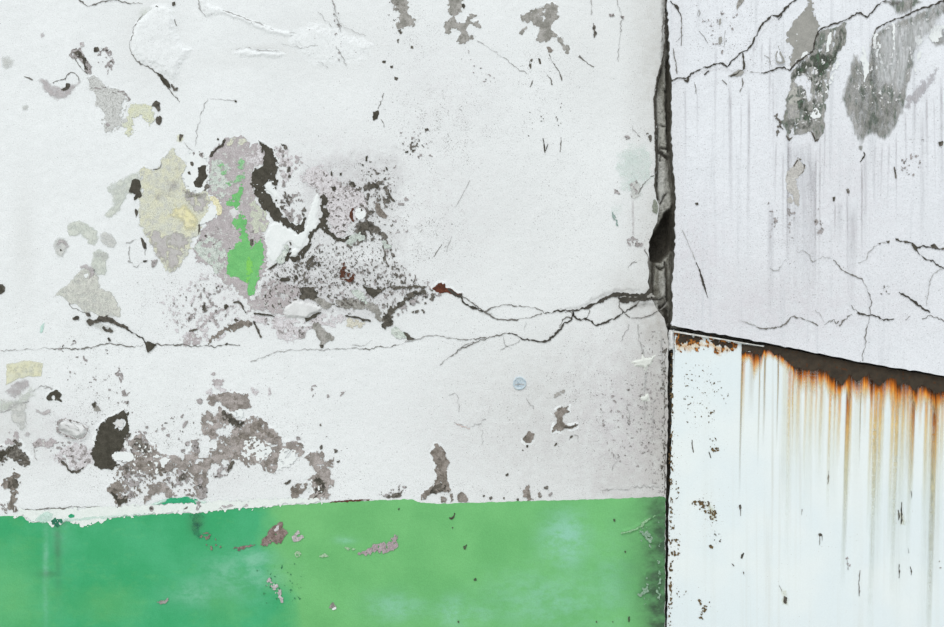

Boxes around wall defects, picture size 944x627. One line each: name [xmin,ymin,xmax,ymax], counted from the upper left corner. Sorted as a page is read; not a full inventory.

peeling [69,42,162,137]
peeling [387,0,419,43]
peeling [442,0,594,87]
crack [609,0,624,61]
crack [624,0,944,214]
peeling [774,0,944,162]
peeling [106,99,464,348]
crack [740,238,944,361]
peeling [0,372,407,514]
crack [1,250,668,494]
peeling [419,441,468,503]
rust [667,332,944,626]